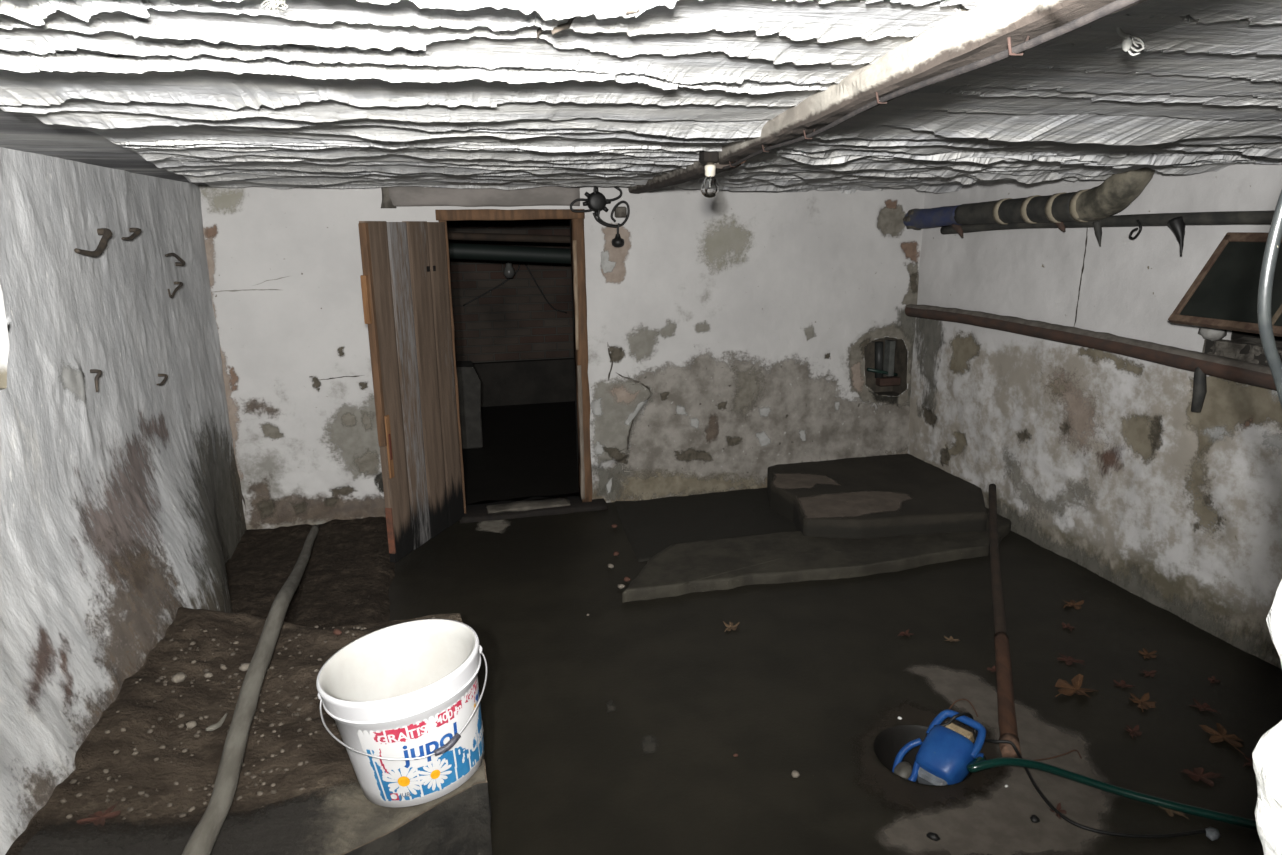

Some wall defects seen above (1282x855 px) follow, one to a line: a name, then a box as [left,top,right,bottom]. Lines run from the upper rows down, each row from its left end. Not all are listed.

peeling [601,223,631,283]
damp [704,215,751,270]
spalling [877,199,920,305]
spalling [609,346,625,363]
spalling [847,322,937,427]
spalling [948,331,980,375]
spalling [220,348,386,528]
damp [322,396,381,479]
spalling [1097,415,1163,474]
damp [180,419,247,608]
damp [984,449,1281,669]
damp [16,412,183,831]